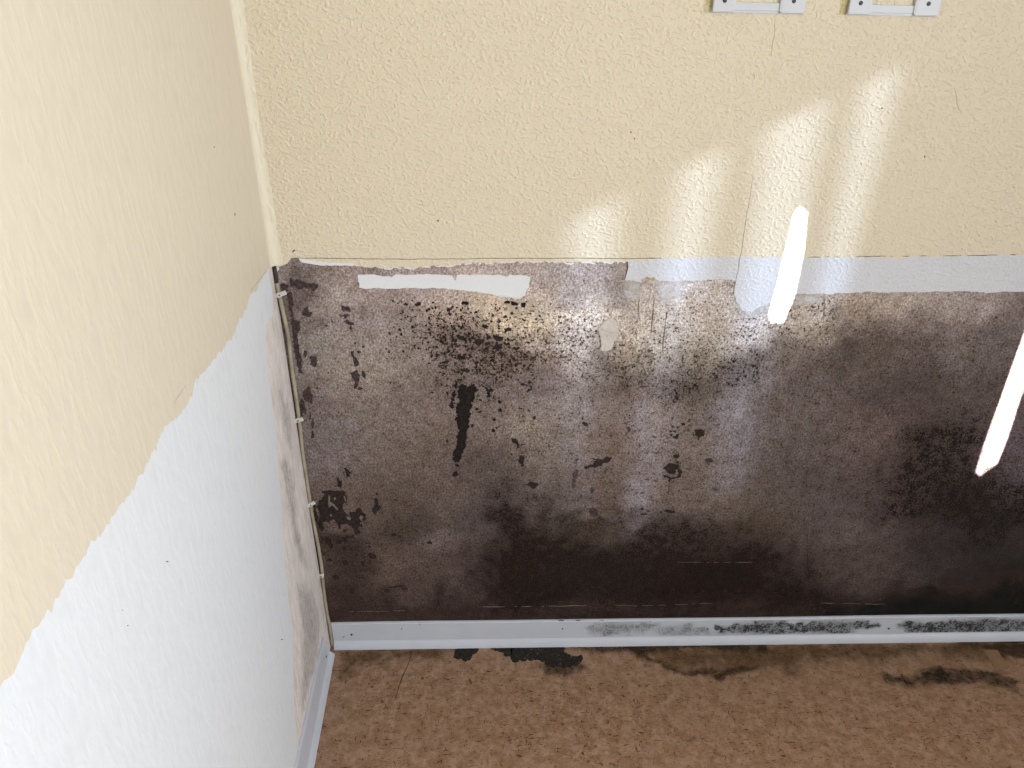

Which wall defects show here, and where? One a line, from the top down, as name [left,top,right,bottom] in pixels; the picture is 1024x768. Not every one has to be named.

water stain [280,268,319,374]
water stain [299,386,319,439]
peeling [266,258,1024,744]
water stain [313,290,1024,680]
water stain [883,666,1016,692]